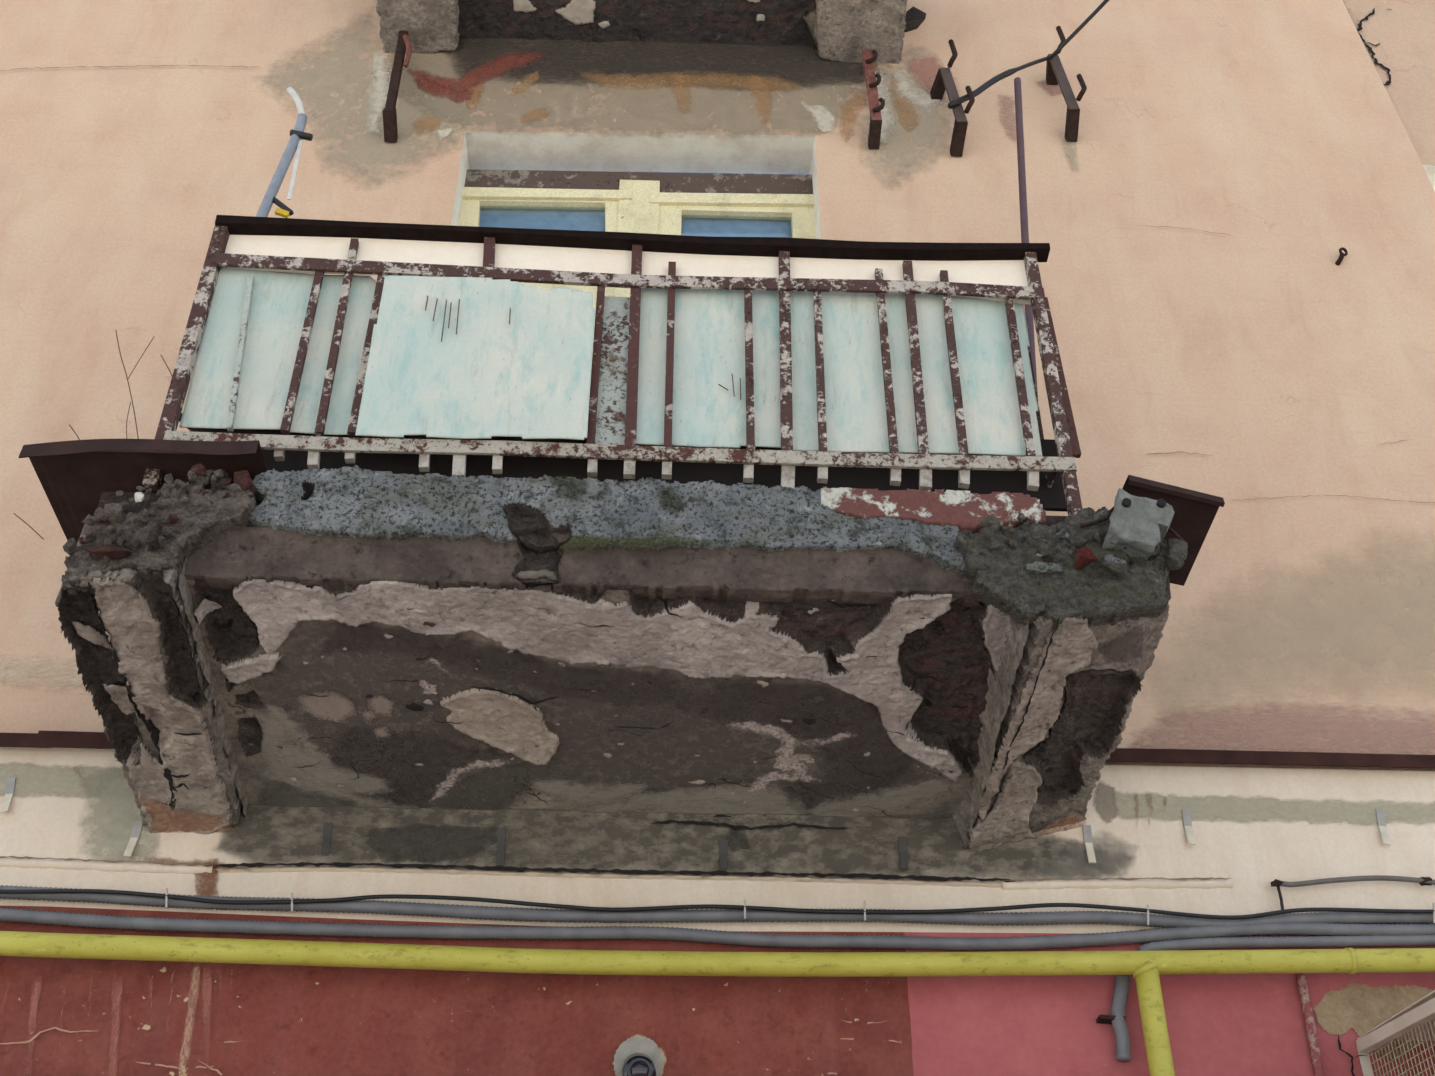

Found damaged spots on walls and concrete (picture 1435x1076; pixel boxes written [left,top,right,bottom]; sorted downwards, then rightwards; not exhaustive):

leakage [270,21,947,175]
peeling [909,58,943,91]
peeling [1002,97,1017,139]
crack [1357,8,1392,85]
spalling [953,512,1188,576]
crack [659,598,683,618]
peeling [58,463,1143,852]
crack [88,582,201,811]
crack [652,753,896,830]
crack [0,856,1229,882]
peeling [1313,983,1432,1036]
peeling [1375,1040,1428,1061]